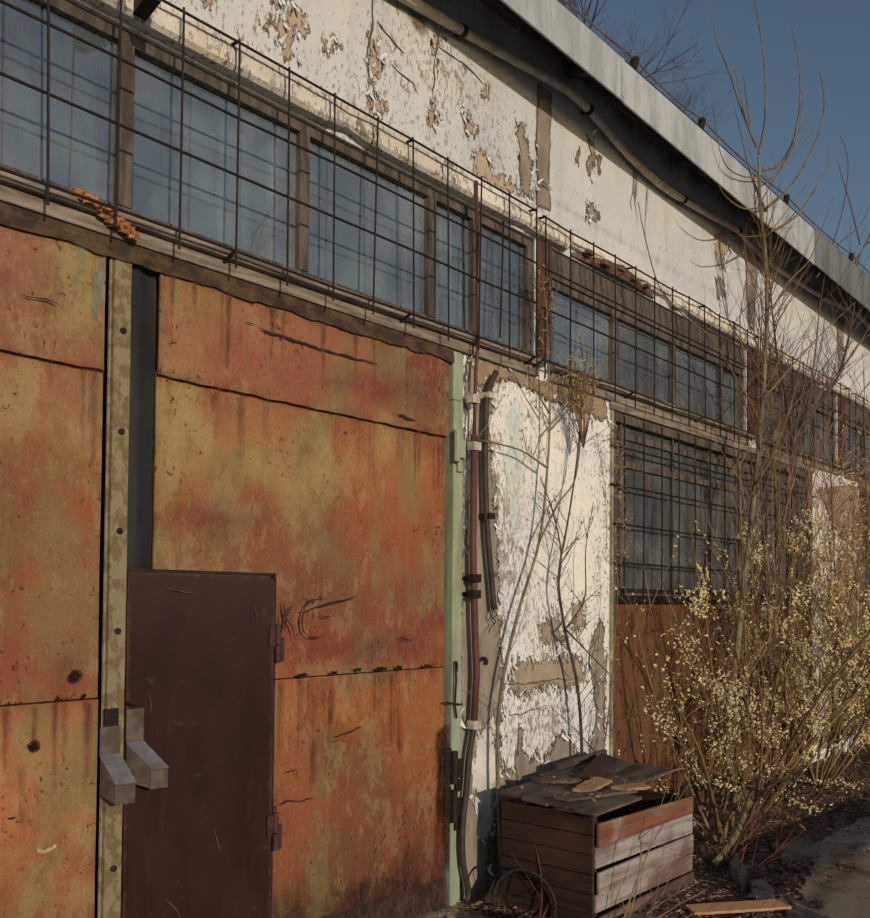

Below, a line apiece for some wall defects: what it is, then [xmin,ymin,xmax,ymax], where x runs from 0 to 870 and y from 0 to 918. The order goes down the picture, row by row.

peeling [258,0,311,65]
peeling [321,32,344,59]
peeling [365,25,389,120]
peeling [429,22,447,62]
peeling [426,97,444,130]
peeling [461,103,550,203]
peeling [573,129,602,181]
peeling [585,196,601,227]
peeling [714,228,735,305]
peeling [459,355,614,900]
corrosion [438,724,450,868]